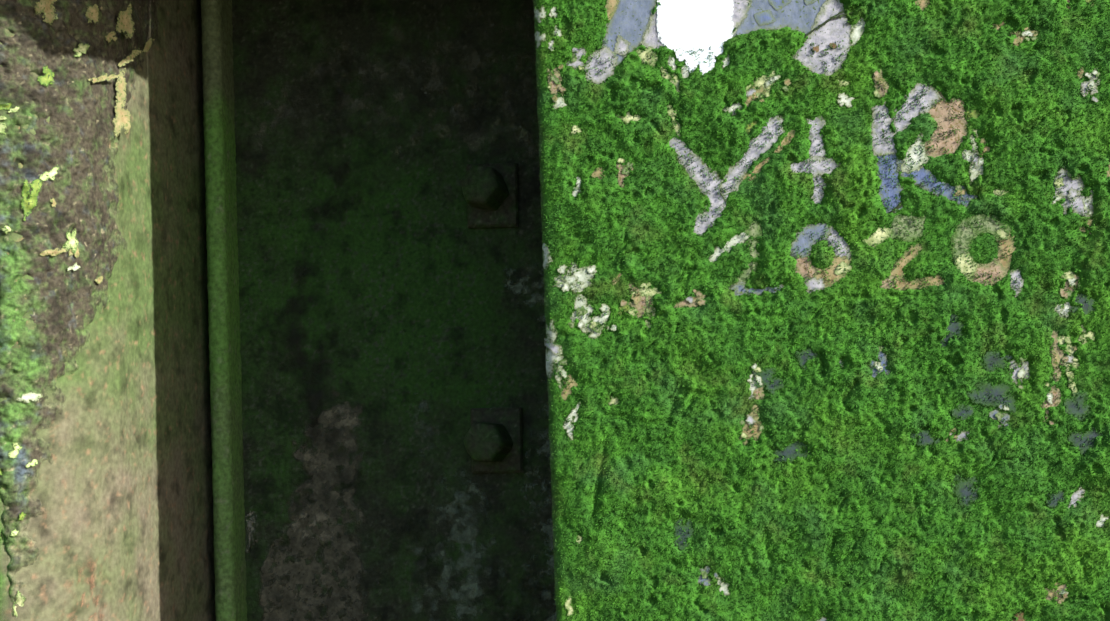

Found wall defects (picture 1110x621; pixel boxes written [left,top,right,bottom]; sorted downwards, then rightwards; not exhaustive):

peeling [547,0,865,115]
flaking render [872,69,889,98]
peeling [951,135,990,201]
flaking render [674,289,706,308]
peeling [731,282,749,294]
peeling [542,243,654,441]